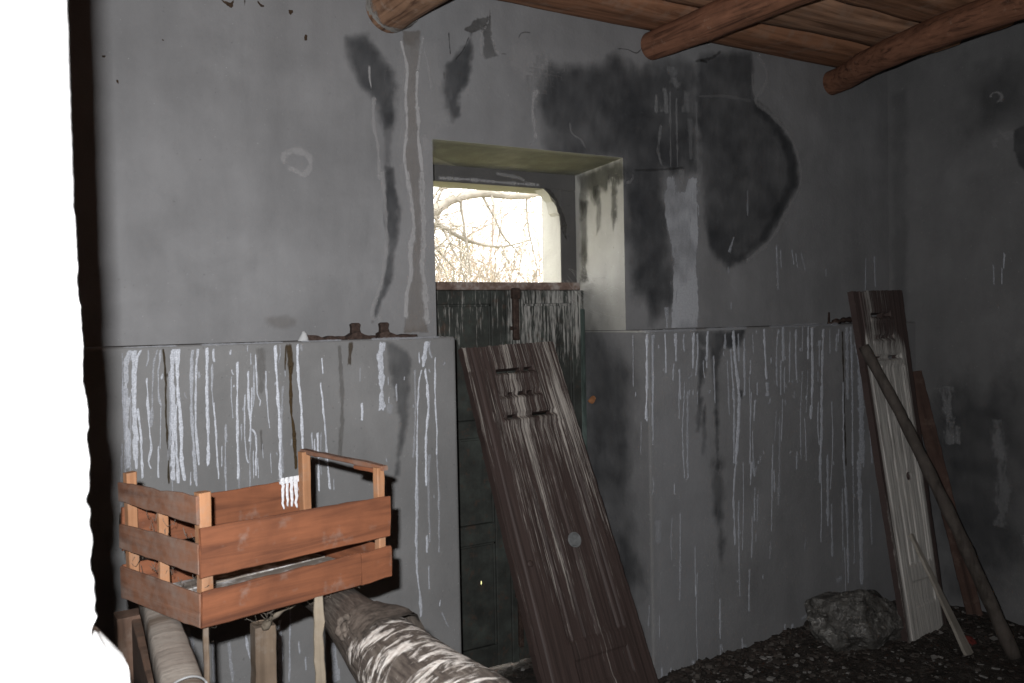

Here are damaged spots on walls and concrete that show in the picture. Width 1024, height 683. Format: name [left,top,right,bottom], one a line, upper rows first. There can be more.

leakage [122,344,335,491]
leakage [350,32,438,617]
leakage [445,43,471,116]
leakage [532,55,873,611]